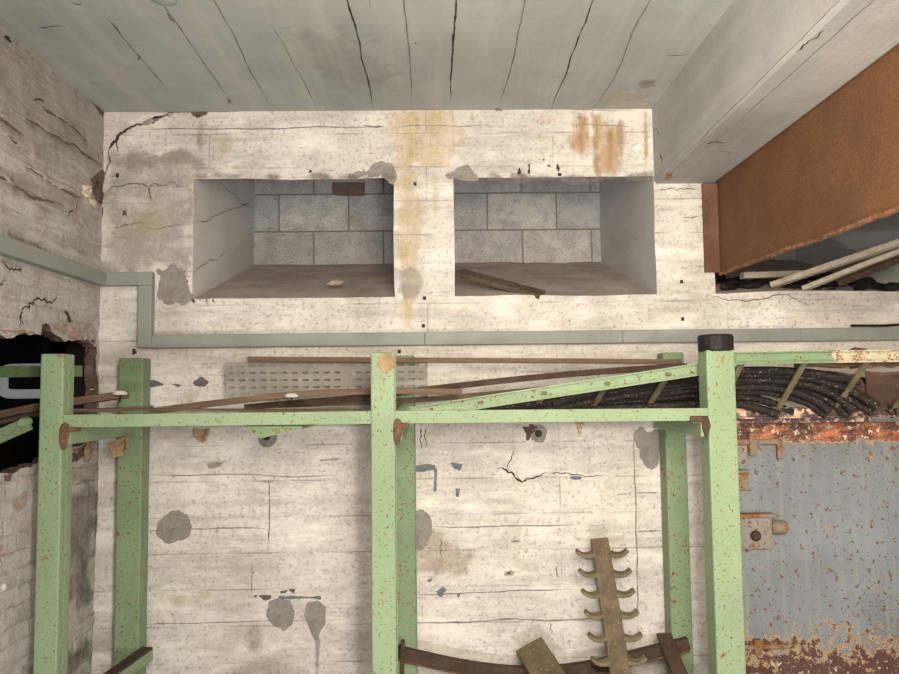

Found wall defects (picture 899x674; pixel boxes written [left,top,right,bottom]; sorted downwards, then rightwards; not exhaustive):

crack [347,0,374,110]
crack [449,0,457,101]
crack [551,0,593,110]
crack [102,112,186,230]
rust [572,117,621,173]
crack [19,295,57,326]
spalling [72,447,84,463]
crack [498,451,602,483]